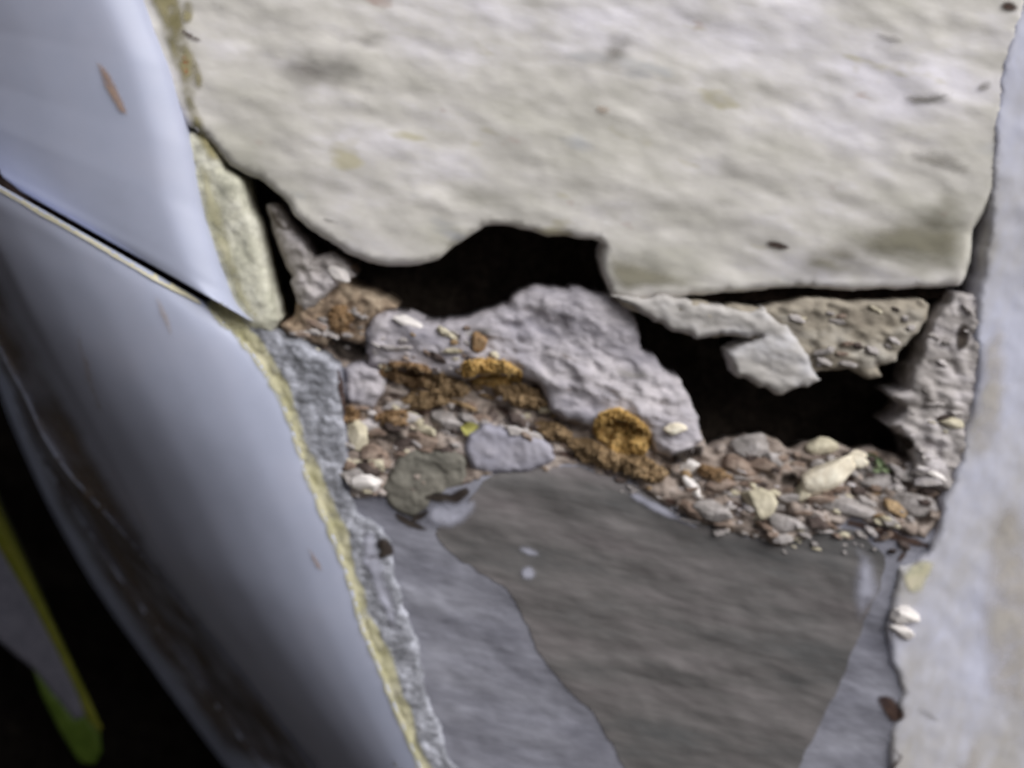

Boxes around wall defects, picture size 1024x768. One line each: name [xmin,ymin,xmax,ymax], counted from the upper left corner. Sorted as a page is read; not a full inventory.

crack [0,173,210,301]
peeling [252,177,980,492]
spalling [374,539,393,558]